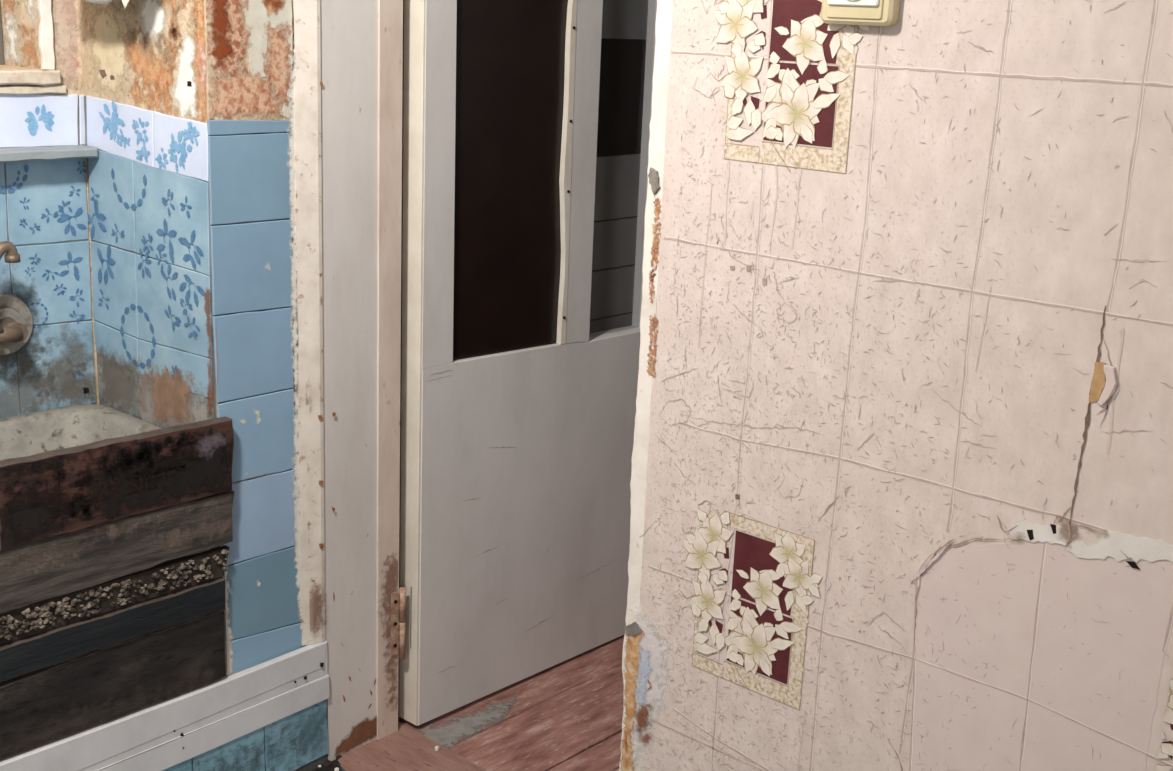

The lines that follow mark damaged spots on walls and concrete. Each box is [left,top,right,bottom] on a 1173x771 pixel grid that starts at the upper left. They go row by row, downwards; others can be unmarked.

peeling [3,0,292,122]
water stain [0,336,37,371]
crack [1096,306,1112,366]
crack [1058,393,1112,524]
peeling [1007,519,1068,545]
corrosion [309,586,322,632]
corrosion [383,559,398,702]
peeling [335,679,377,756]
spalling [620,615,669,771]